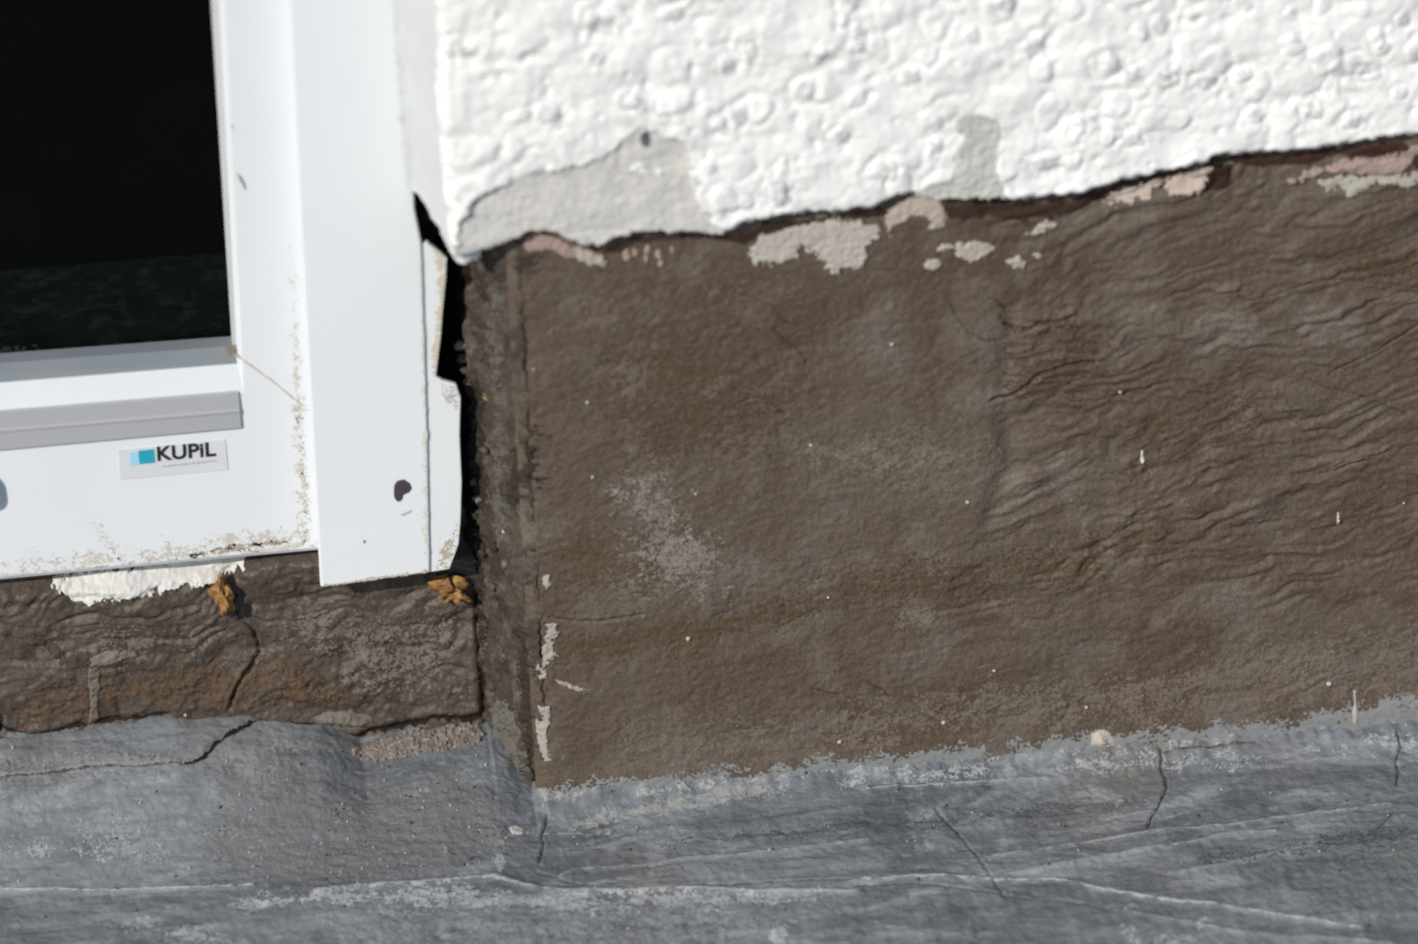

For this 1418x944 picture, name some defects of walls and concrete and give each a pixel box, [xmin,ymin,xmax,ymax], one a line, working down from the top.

spalling [453,127,724,268]
peeling [1101,165,1213,209]
peeling [1286,145,1418,198]
peeling [748,194,1042,276]
peeling [1025,219,1058,235]
crack [229,610,260,707]
crack [0,712,166,734]